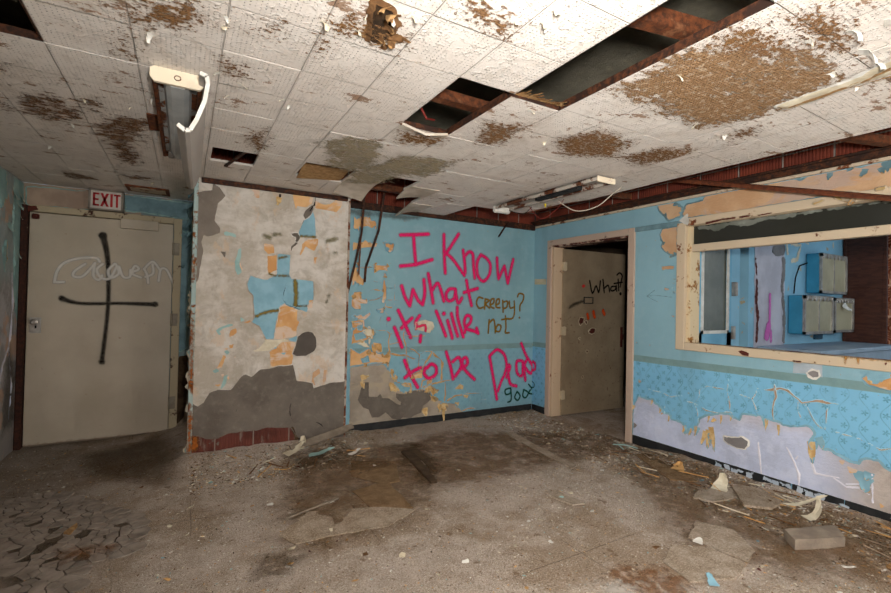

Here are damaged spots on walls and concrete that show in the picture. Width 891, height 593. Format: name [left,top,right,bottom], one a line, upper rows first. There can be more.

peeling [353,0,419,50]
damp [605,0,874,146]
peeling [773,30,891,111]
damp [0,84,160,181]
damp [313,129,457,185]
damp [472,120,527,148]
damp [552,127,698,166]
peeling [657,160,891,294]
peeling [125,184,469,453]
peeling [772,243,809,343]
peeling [860,362,891,393]
flaking render [632,395,891,521]